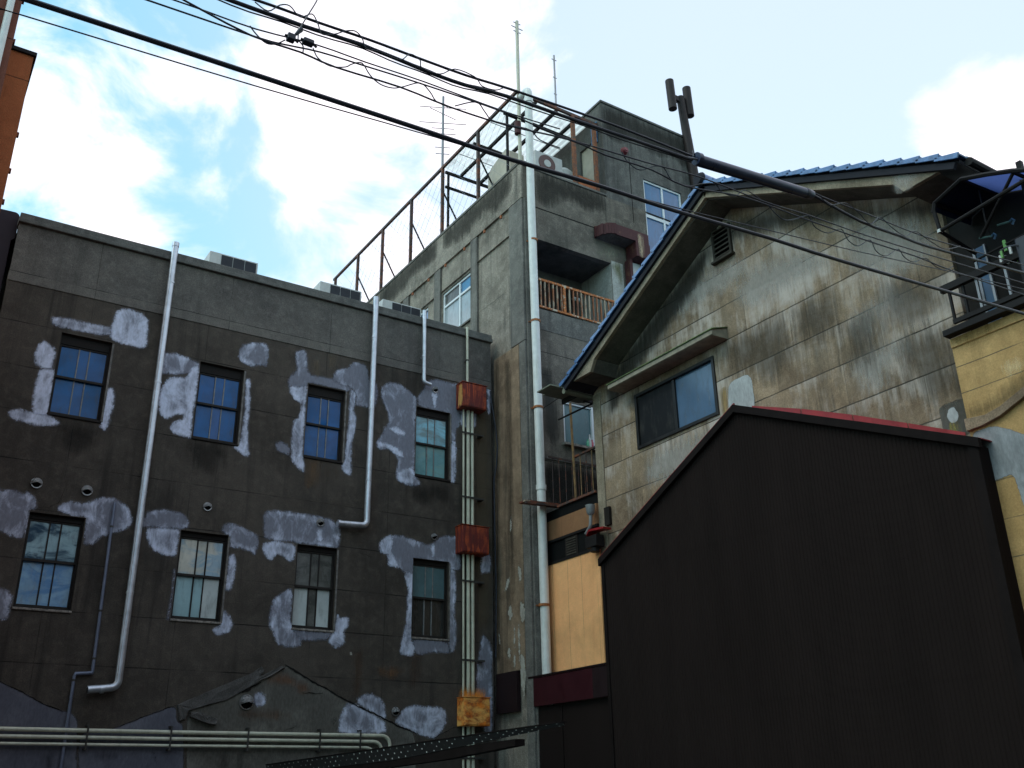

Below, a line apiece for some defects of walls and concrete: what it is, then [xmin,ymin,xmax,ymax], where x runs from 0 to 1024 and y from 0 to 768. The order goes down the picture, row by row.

water stain [537,175,604,209]
peeling [52,309,148,348]
water stain [608,252,707,410]
peeling [9,341,59,426]
peeling [159,353,199,437]
peeling [234,379,251,457]
peeling [275,350,491,486]
peeling [0,490,36,538]
peeling [222,510,340,590]
peeling [269,589,349,648]
peeling [379,535,461,656]
flaking render [0,666,446,768]